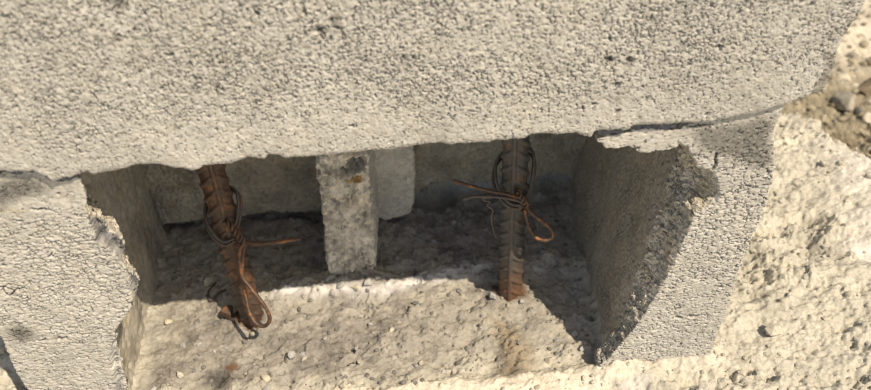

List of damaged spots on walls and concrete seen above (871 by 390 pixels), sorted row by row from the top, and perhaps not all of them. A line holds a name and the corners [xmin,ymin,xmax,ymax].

crack [596,124,713,136]
spalling [324,157,366,176]
spalling [92,216,125,256]
spalling [195,163,264,329]
spalling [498,135,531,302]